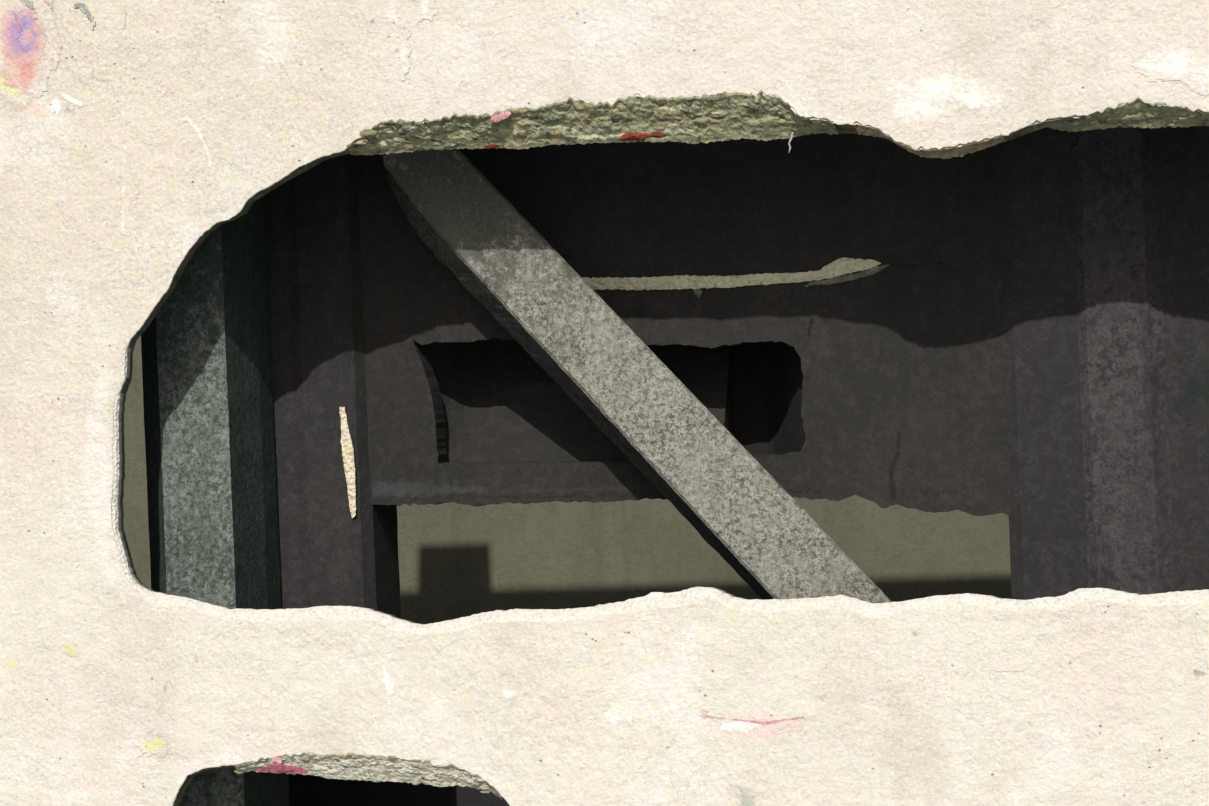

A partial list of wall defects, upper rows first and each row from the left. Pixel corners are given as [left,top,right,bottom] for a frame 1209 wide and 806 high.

spalling [346,85,838,156]
spalling [854,121,1006,159]
spalling [1031,97,1209,132]
spalling [582,257,890,298]
spalling [339,407,356,518]
spalling [234,752,503,801]